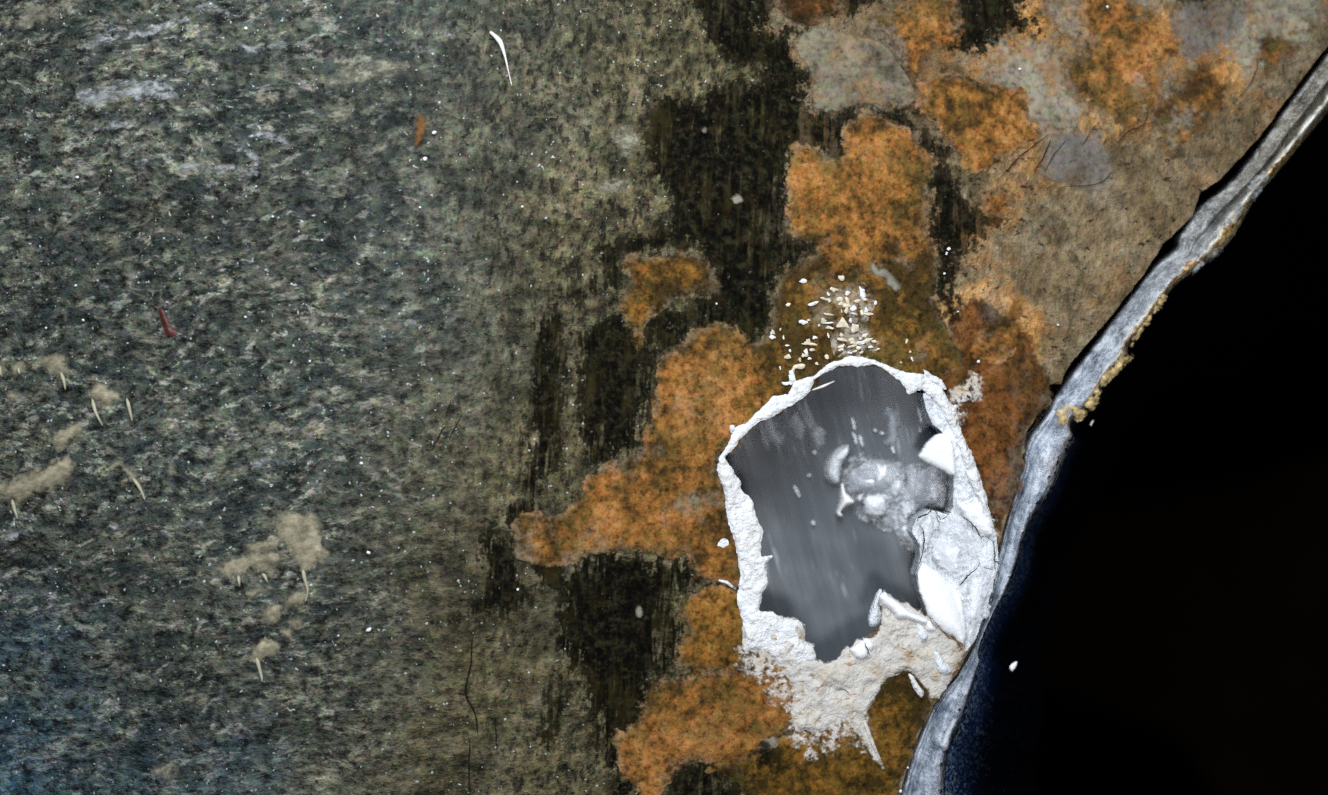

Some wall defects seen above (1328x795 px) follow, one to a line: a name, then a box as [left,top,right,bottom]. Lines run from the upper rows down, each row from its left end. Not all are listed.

rust [775,0,845,26]
rust [869,0,1041,175]
rust [1038,0,1227,158]
rust [1256,32,1299,74]
water stain [567,239,634,309]
water stain [448,311,717,795]
rust [510,108,1052,795]
spalling [716,275,994,770]
water stain [749,740,784,773]